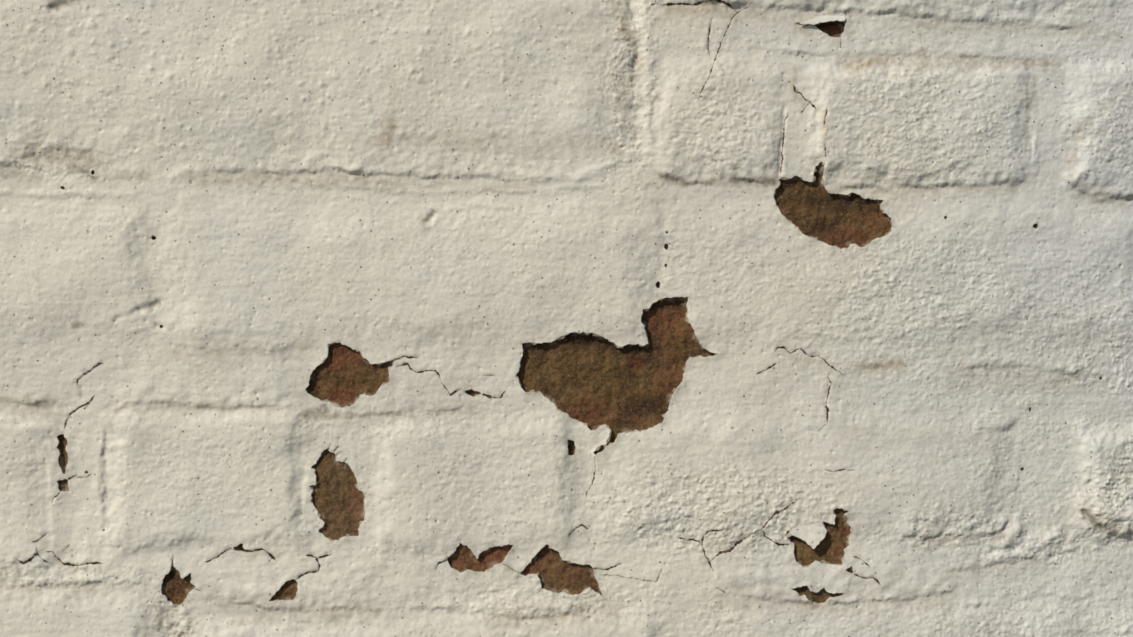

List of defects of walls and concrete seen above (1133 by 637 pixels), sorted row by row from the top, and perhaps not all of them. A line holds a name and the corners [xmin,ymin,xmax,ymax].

crack [651,0,751,101]
peeling [774,162,893,249]
crack [64,363,102,428]
peeling [305,342,395,408]
crack [389,356,505,398]
peeling [516,297,717,456]
crack [757,346,844,431]
peeling [310,448,365,541]
crack [17,533,102,569]
peeling [521,544,603,596]
crack [679,499,798,593]
peeling [786,508,854,574]